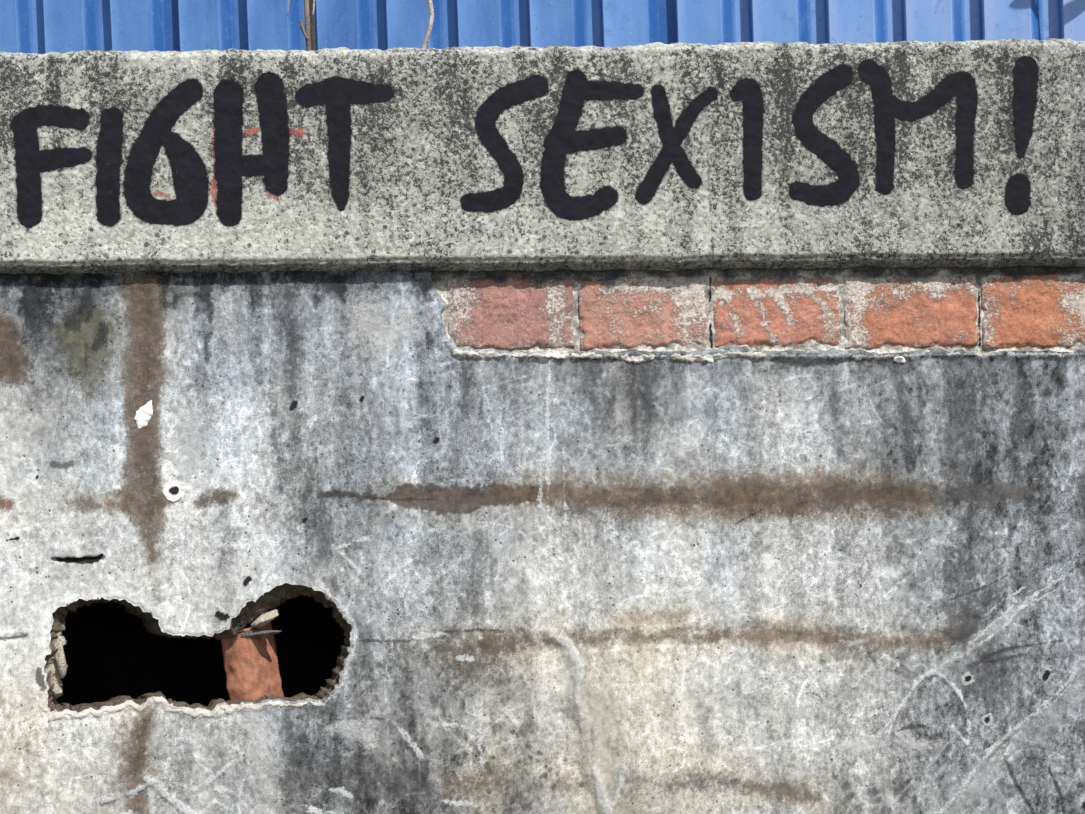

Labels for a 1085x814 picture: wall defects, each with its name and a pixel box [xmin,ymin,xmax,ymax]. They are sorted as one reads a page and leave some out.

water stain [240,272,262,321]
spalling [415,265,1085,367]
water stain [265,271,367,574]
water stain [458,364,475,414]
water stain [537,351,566,624]
rust [317,469,1032,520]
water stain [838,345,1065,753]
spalling [36,576,359,721]
water stain [412,631,447,640]
water stain [246,704,433,814]
water stain [441,710,495,767]
water stain [935,670,1079,814]